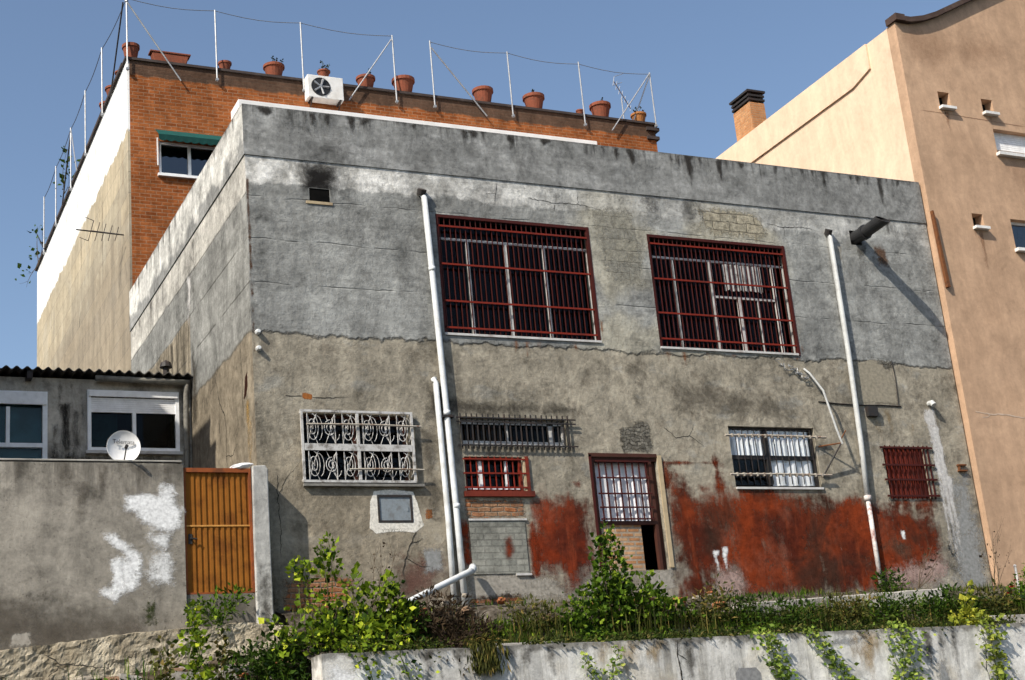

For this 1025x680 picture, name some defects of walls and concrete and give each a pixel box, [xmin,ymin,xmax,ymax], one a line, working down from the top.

leakage [677,156,701,176]
spalling [619,422,653,453]
efflorescence [924,409,960,548]
peeling [461,496,597,605]
flaking render [283,574,354,611]